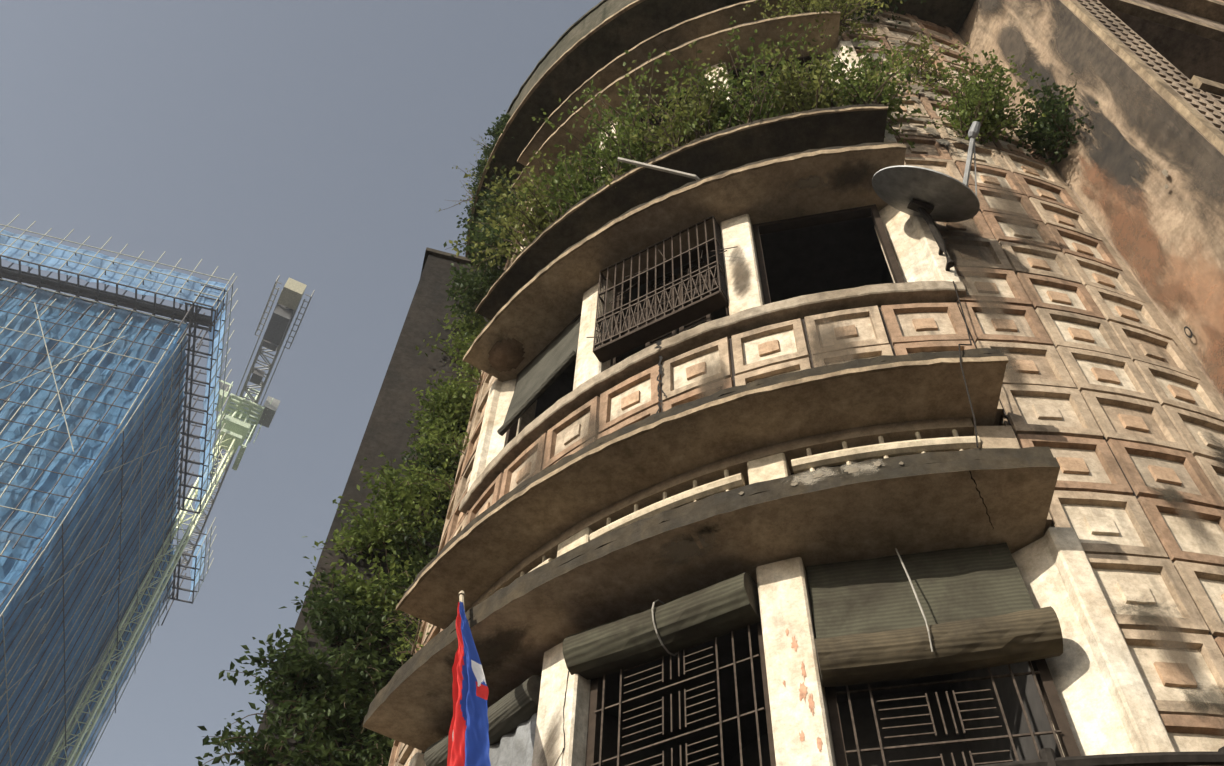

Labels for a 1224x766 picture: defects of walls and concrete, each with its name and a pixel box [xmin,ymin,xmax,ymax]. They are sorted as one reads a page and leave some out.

water stain [998,0,1224,221]
water stain [989,176,1045,244]
water stain [733,251,749,294]
water stain [944,219,1007,320]
spalling [790,461,882,486]
crack [969,471,994,529]